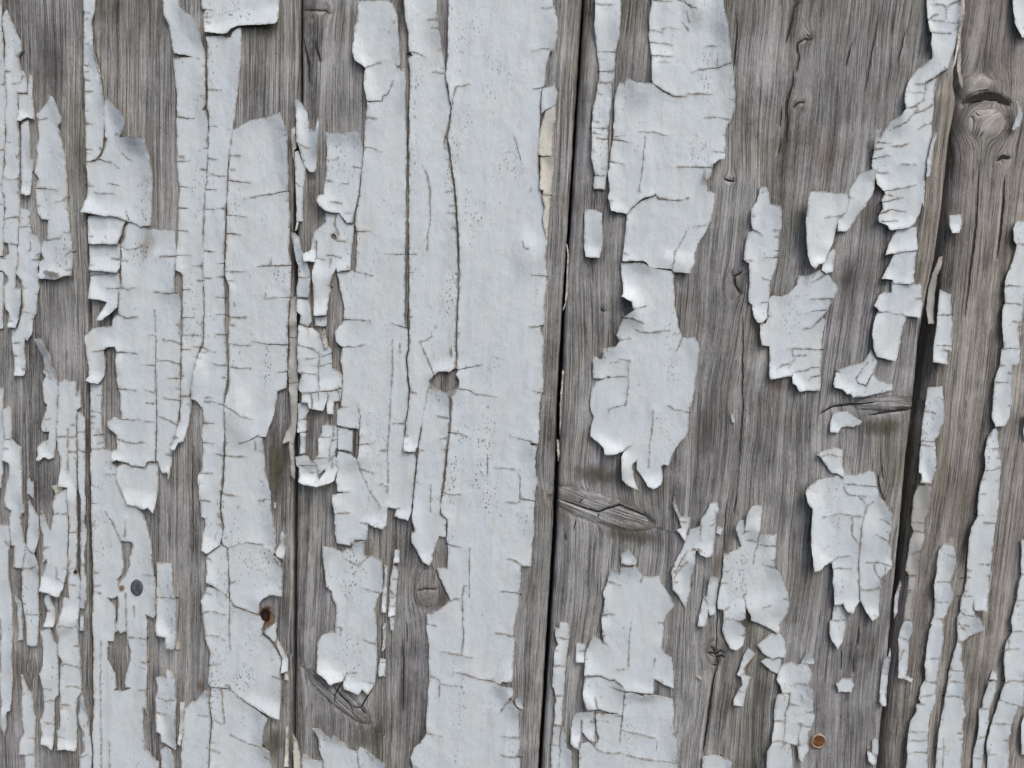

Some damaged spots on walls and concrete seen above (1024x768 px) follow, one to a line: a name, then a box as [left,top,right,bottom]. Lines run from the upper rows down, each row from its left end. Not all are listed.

crack [304,41,321,81]
peeling [1012,0,1024,38]
peeling [584,0,735,489]
peeling [742,0,965,398]
peeling [0,0,558,768]
crack [560,499,653,539]
peeling [550,496,815,768]
peeling [830,411,862,433]
peeling [806,447,893,649]
crack [820,402,913,415]
peeling [879,221,1024,768]
peeling [867,737,879,766]